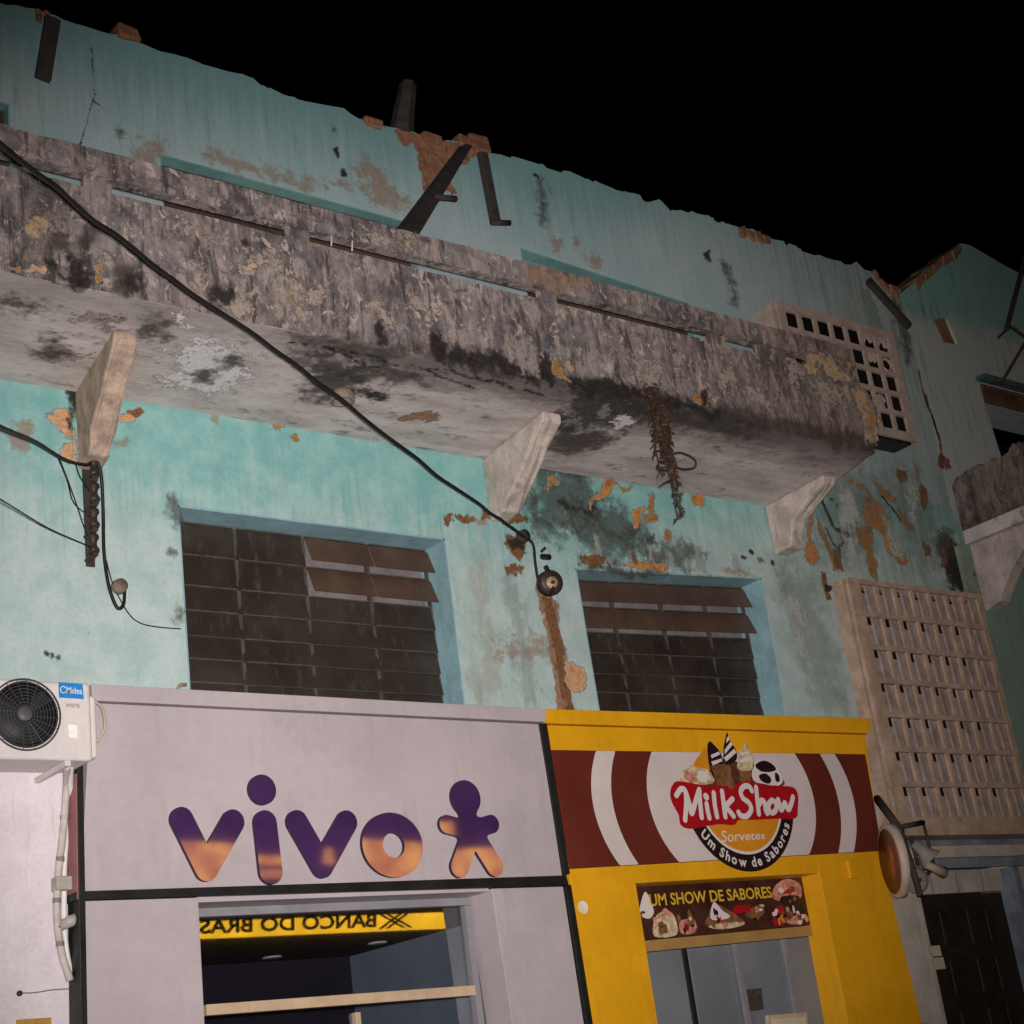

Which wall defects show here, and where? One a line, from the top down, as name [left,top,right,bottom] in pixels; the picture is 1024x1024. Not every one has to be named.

flaking render [361,116,491,191]
leakage [44,224,96,292]
leakage [113,266,142,297]
leakage [208,285,235,306]
peeling [45,408,78,464]
peeling [119,406,144,423]
leakage [429,323,872,455]
spalling [443,510,528,576]
leakage [525,469,705,572]
peeling [631,492,672,545]
peeling [849,479,914,580]
corrosion [535,586,574,710]